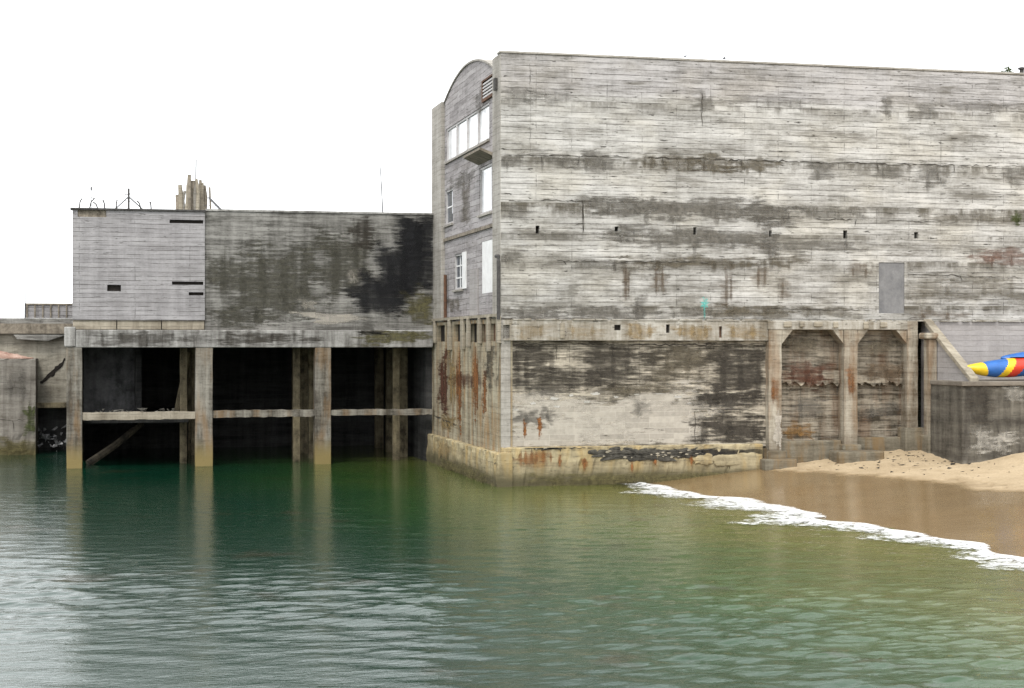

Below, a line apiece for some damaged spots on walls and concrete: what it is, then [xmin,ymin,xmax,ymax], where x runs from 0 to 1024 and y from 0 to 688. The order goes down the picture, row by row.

leakage [644,153,782,173]
leakage [808,161,834,179]
leakage [205,215,433,345]
rust [437,347,487,435]
leakage [512,341,766,457]
rust [771,361,832,399]